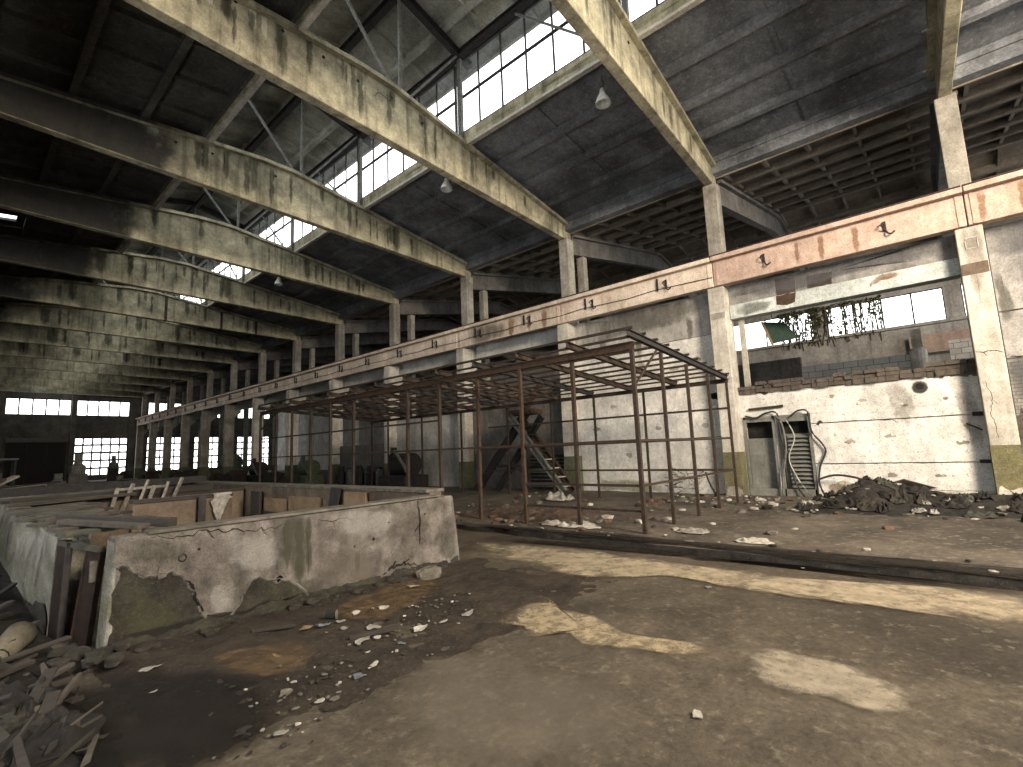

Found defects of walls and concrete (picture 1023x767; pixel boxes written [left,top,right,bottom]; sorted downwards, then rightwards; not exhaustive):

leakage [197,0,237,41]
leakage [249,9,287,69]
leakage [342,62,363,109]
leakage [386,92,395,123]
leakage [419,115,443,157]
leakage [347,203,413,252]
leakage [128,256,231,297]
crack [150,523,290,539]
leakage [284,524,311,578]
crack [375,501,421,578]
spalling [107,564,207,646]
spalling [230,573,309,615]